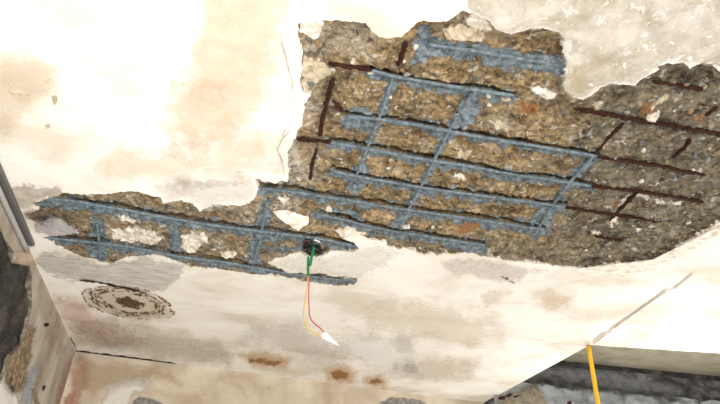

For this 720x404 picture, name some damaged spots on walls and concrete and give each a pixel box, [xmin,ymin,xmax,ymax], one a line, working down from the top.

leakage [169,0,288,147]
rust [328,61,373,72]
rust [296,136,332,144]
spalling [8,11,720,292]
rust [593,122,706,177]
rust [591,184,704,203]
rust [565,205,662,223]
leakage [81,286,175,319]
rust [244,354,289,367]
rust [326,366,353,382]